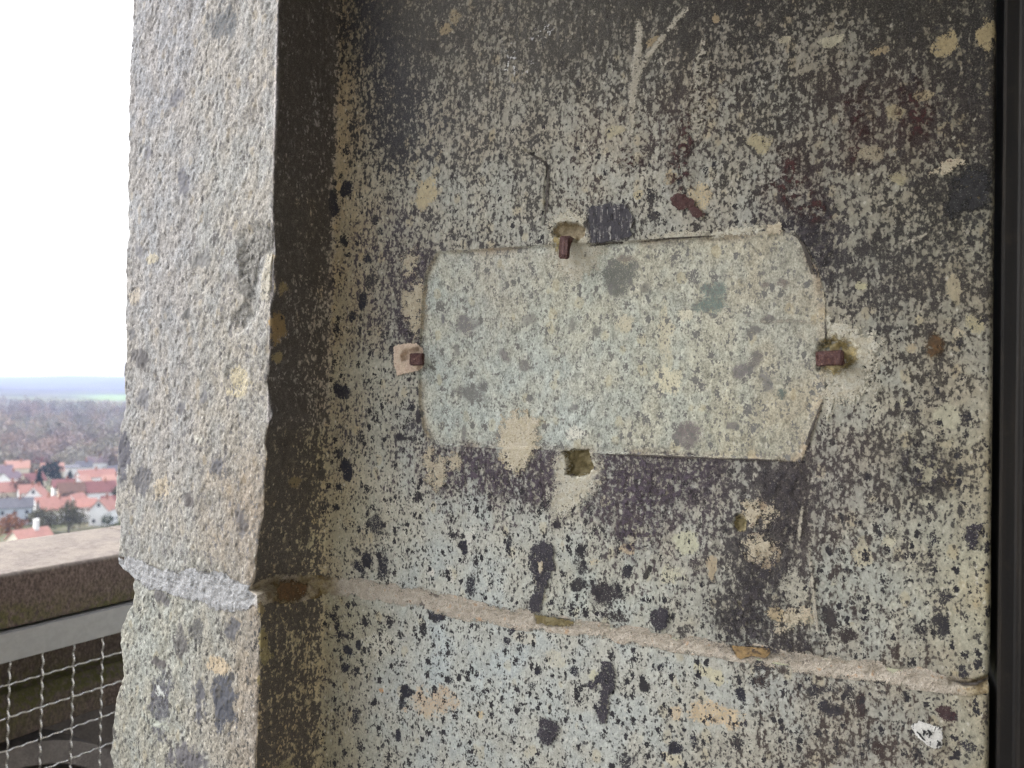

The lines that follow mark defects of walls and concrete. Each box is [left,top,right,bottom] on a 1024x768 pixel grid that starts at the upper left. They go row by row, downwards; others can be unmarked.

rust [820,335,859,375]
leakage [417,441,559,508]
spalling [494,406,609,518]
leakage [590,442,723,562]
peeling [911,720,943,749]